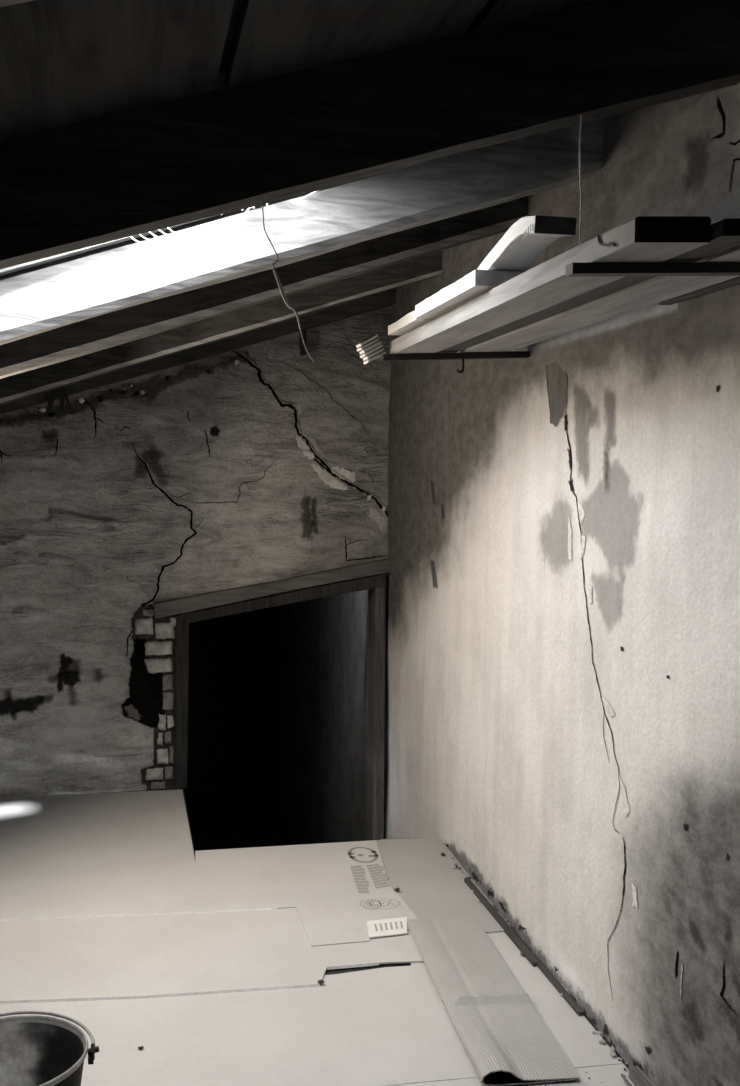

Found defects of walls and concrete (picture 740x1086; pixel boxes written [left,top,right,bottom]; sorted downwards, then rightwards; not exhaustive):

crack [710,97,740,192]
flaking render [546,362,567,426]
crack [84,350,388,658]
leakage [0,654,81,719]
flaking render [121,602,184,790]
crack [564,398,638,1001]
leakage [689,921,703,949]